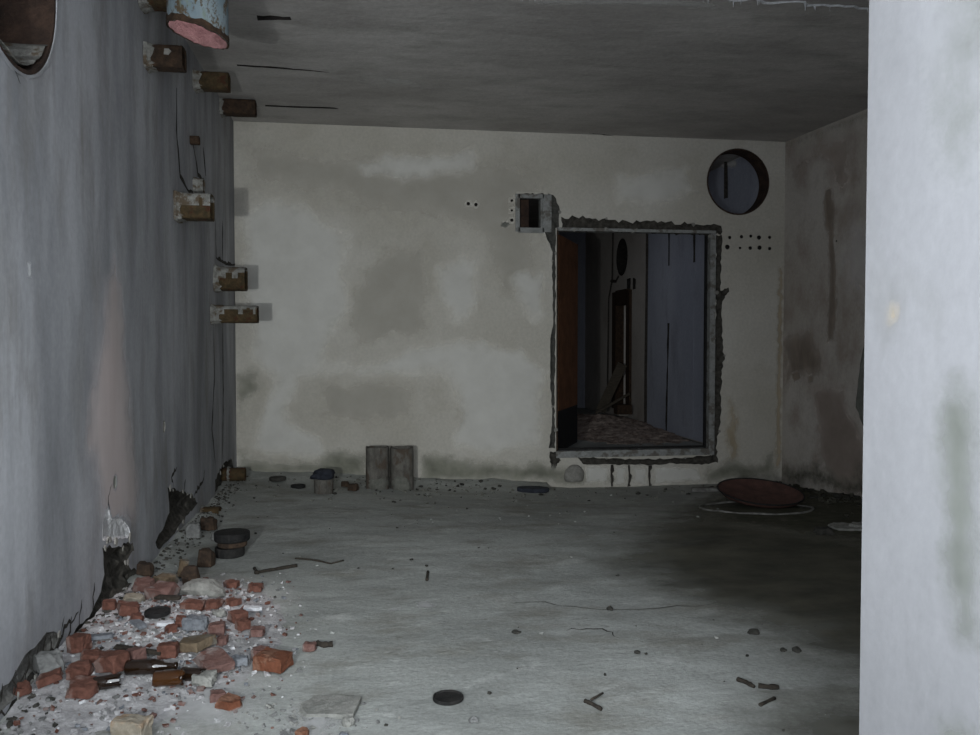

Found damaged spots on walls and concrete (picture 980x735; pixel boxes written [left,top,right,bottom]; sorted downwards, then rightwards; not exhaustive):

crack [708,0,869,11]
spalling [856,348,864,424]
crack [171,467,205,496]
crack [610,465,652,487]
crack [0,582,95,716]